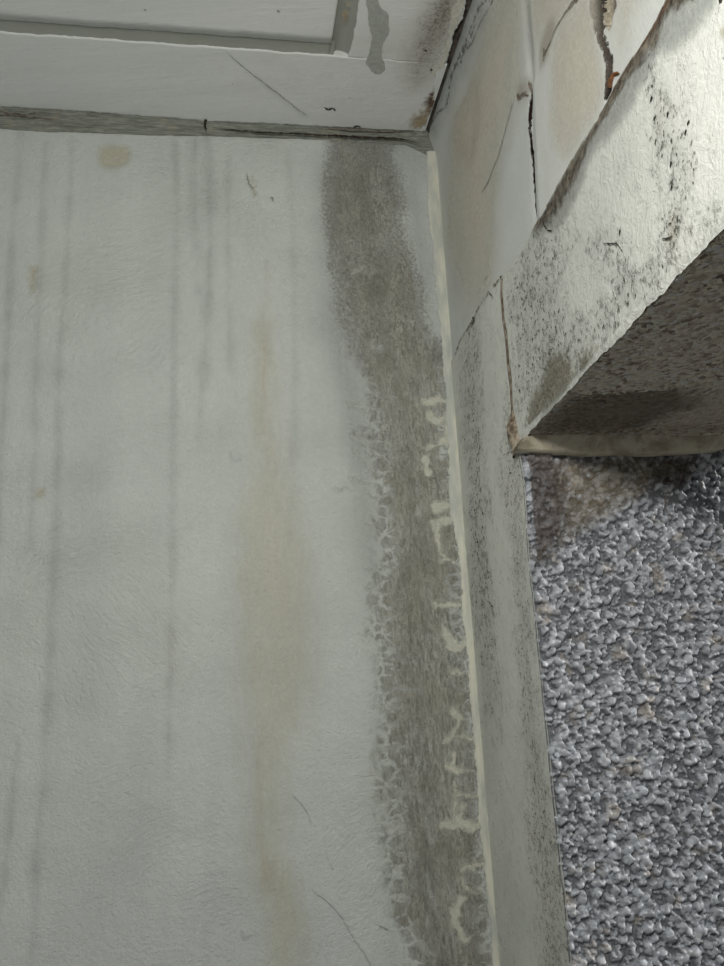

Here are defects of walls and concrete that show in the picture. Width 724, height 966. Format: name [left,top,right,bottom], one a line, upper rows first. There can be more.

peeling [366,0,389,74]
crack [552,0,613,100]
crack [481,81,555,231]
damp [323,140,503,966]
damp [499,0,697,966]